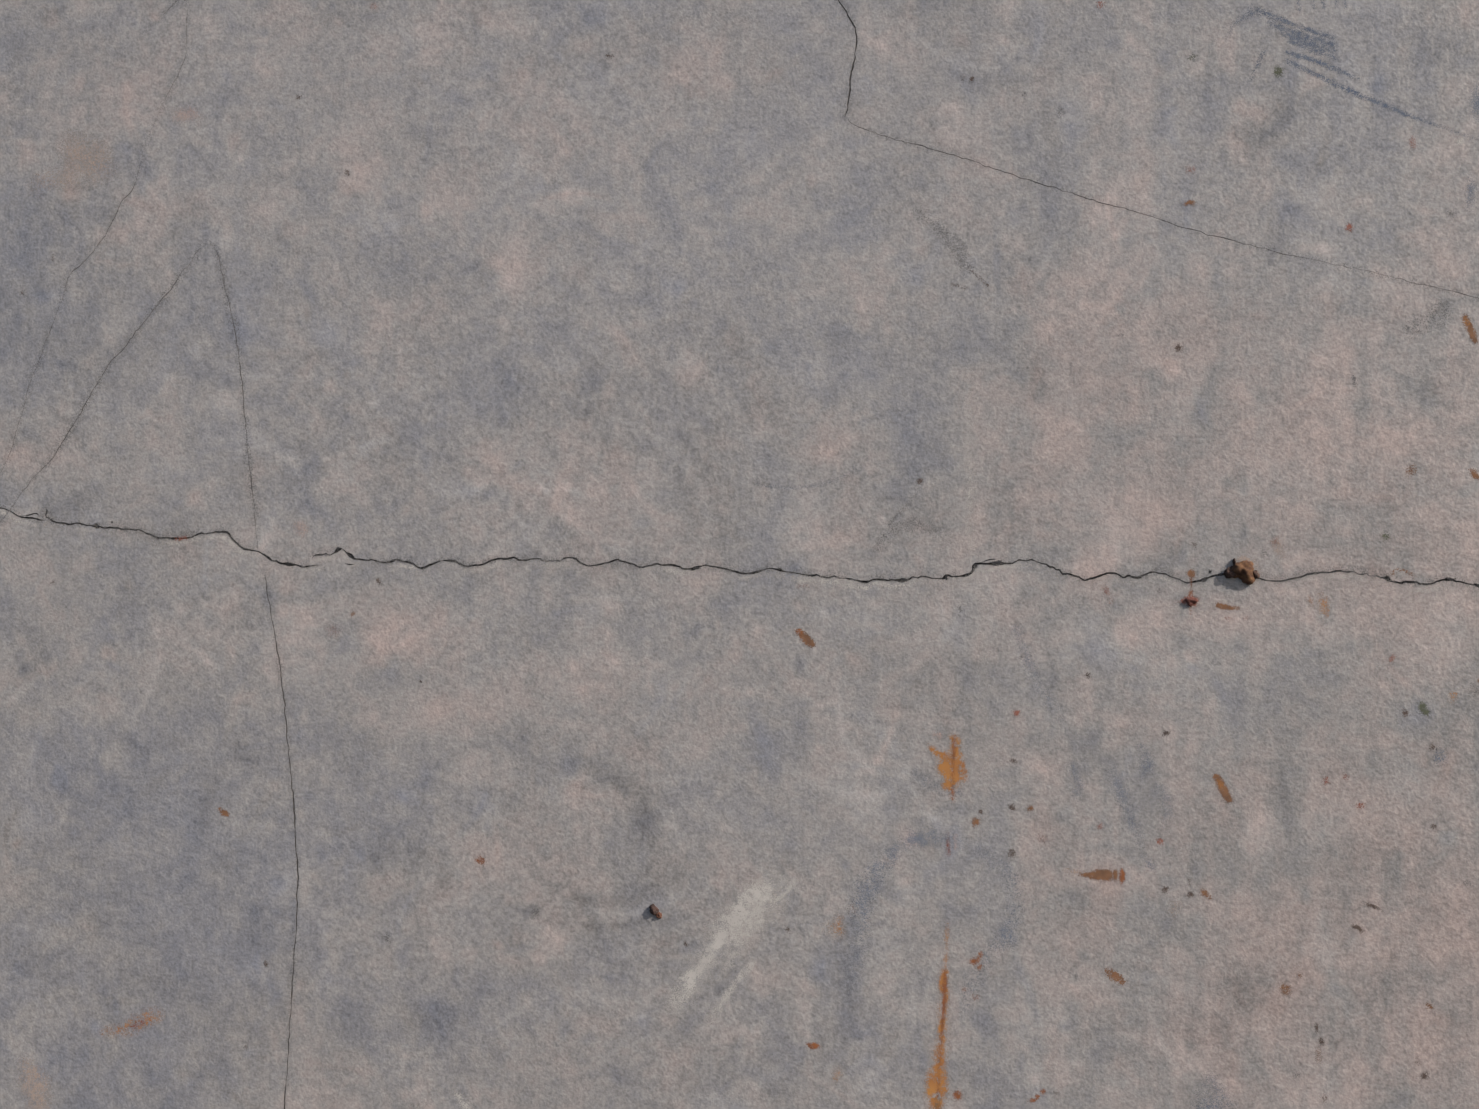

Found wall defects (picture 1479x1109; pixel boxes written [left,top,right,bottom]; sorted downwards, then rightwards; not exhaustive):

crack [836,0,1479,299]
crack [0,0,189,473]
rust [1461,313,1478,344]
rust [795,628,816,648]
crack [0,243,1479,1109]
rust [928,732,969,802]
rust [1212,773,1234,804]
rust [1062,868,1126,884]
rust [924,923,978,1109]